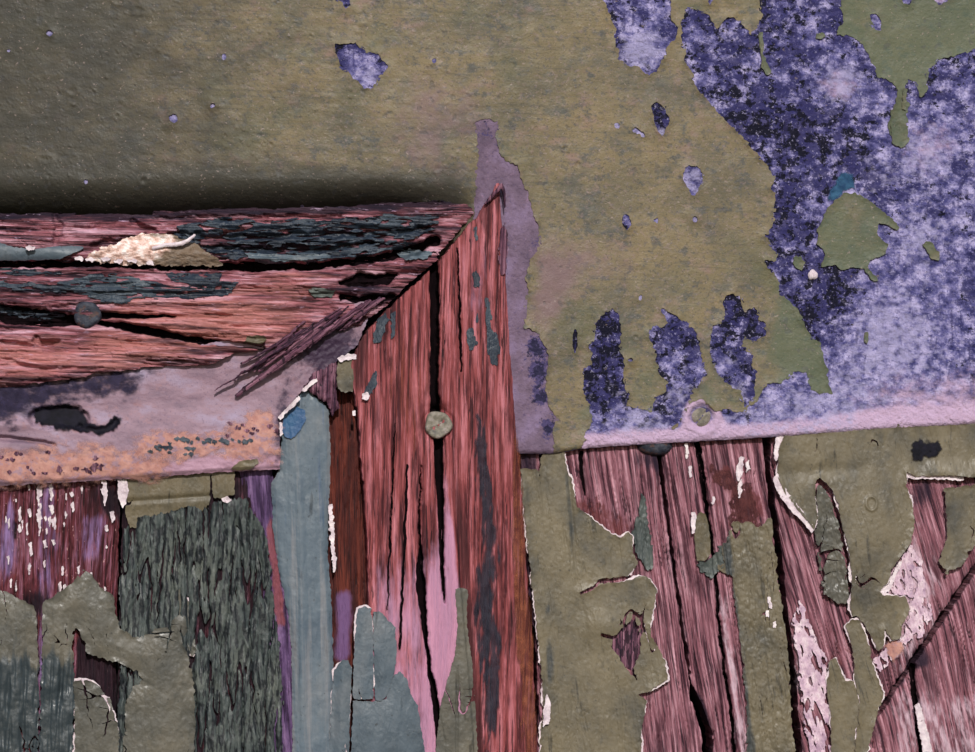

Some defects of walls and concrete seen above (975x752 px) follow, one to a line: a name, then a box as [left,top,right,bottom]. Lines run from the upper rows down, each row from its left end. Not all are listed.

peeling [335,43,388,90]
peeling [0,213,439,304]
peeling [0,306,65,319]
crack [0,236,463,412]
peeling [243,335,267,345]
peeling [373,311,396,344]
peeling [572,0,975,752]
rust [0,410,280,487]
peeling [466,119,670,752]
peeling [0,455,284,752]
crack [386,423,445,738]